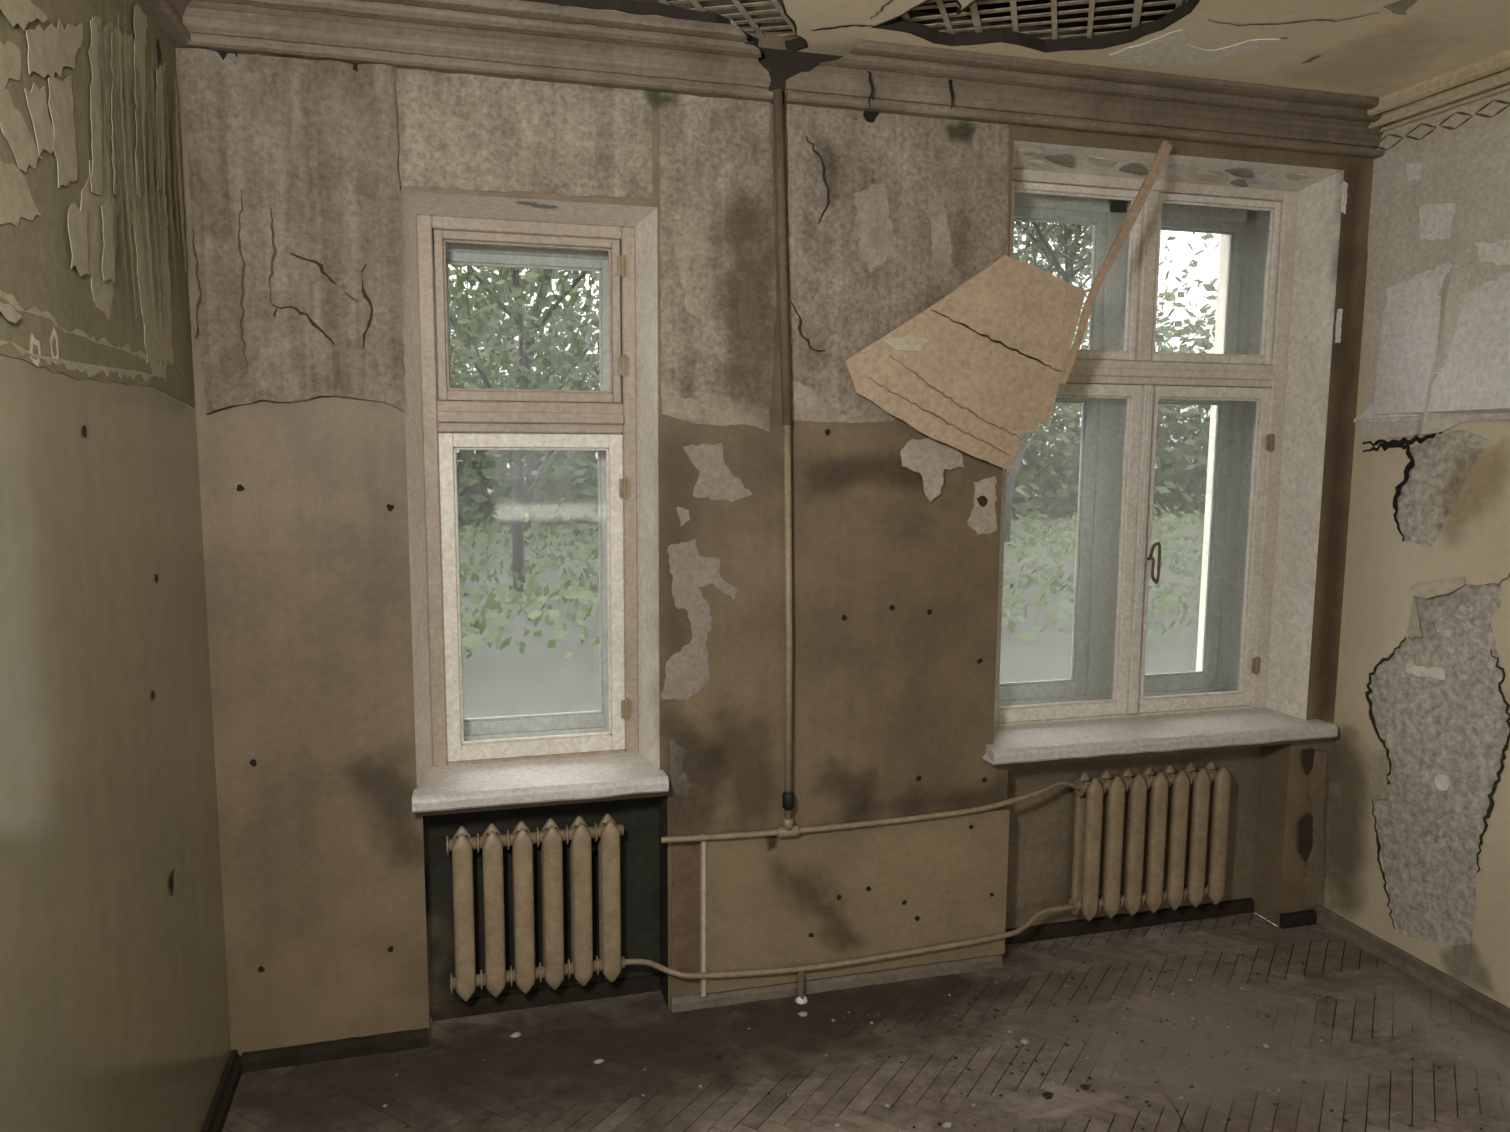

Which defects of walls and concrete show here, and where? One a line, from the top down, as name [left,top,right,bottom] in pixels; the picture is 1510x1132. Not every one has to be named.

spalling [511,0,808,51]
spalling [870,0,1200,53]
crack [171,187,202,339]
crack [238,189,373,370]
peeling [30,328,59,366]
peeling [900,438,964,502]
peeling [967,476,997,535]
spalling [1362,429,1490,547]
peeling [661,443,752,700]
spalling [1365,577,1510,976]